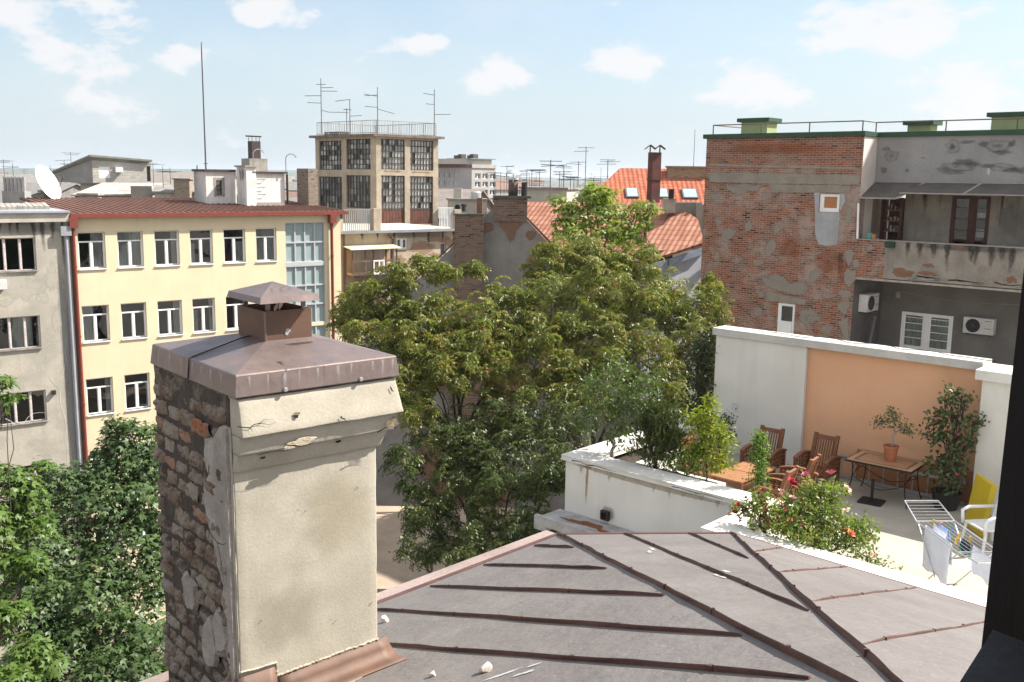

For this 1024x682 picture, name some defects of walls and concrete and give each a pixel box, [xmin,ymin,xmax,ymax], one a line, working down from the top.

leakage [906,242,950,258]
leakage [968,246,1016,265]
flaking render [753,224,820,316]
flaking render [799,245,875,341]
spalling [283,437,317,450]
flaking render [153,383,237,682]
rust [561,517,609,532]